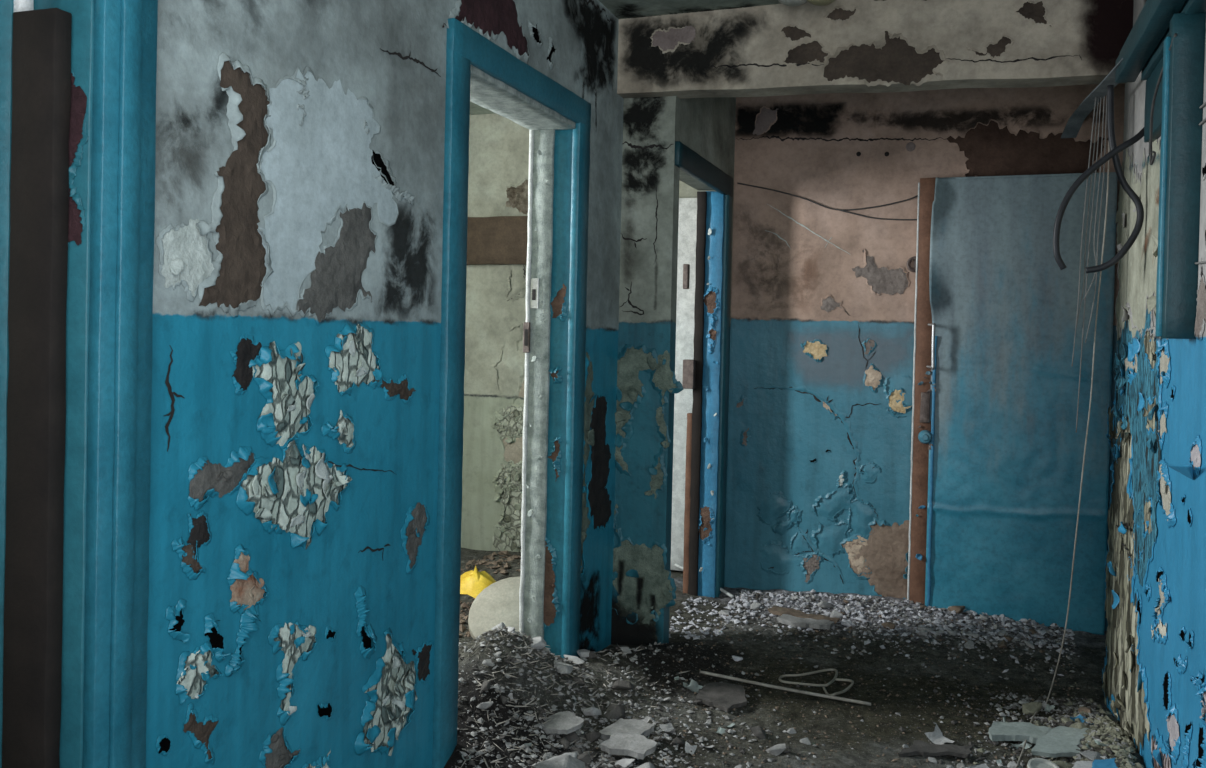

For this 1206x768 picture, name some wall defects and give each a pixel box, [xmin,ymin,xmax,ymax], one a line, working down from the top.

spalling [442,0,554,70]
spalling [781,24,950,87]
spalling [1014,0,1053,28]
flaking render [156,52,416,580]
crack [844,309,876,370]
spalling [852,248,910,296]
peeling [581,344,684,643]
crack [754,385,878,519]
spalling [839,505,926,599]
peeling [1102,139,1206,768]
peeling [166,544,338,768]
peeling [354,585,433,756]